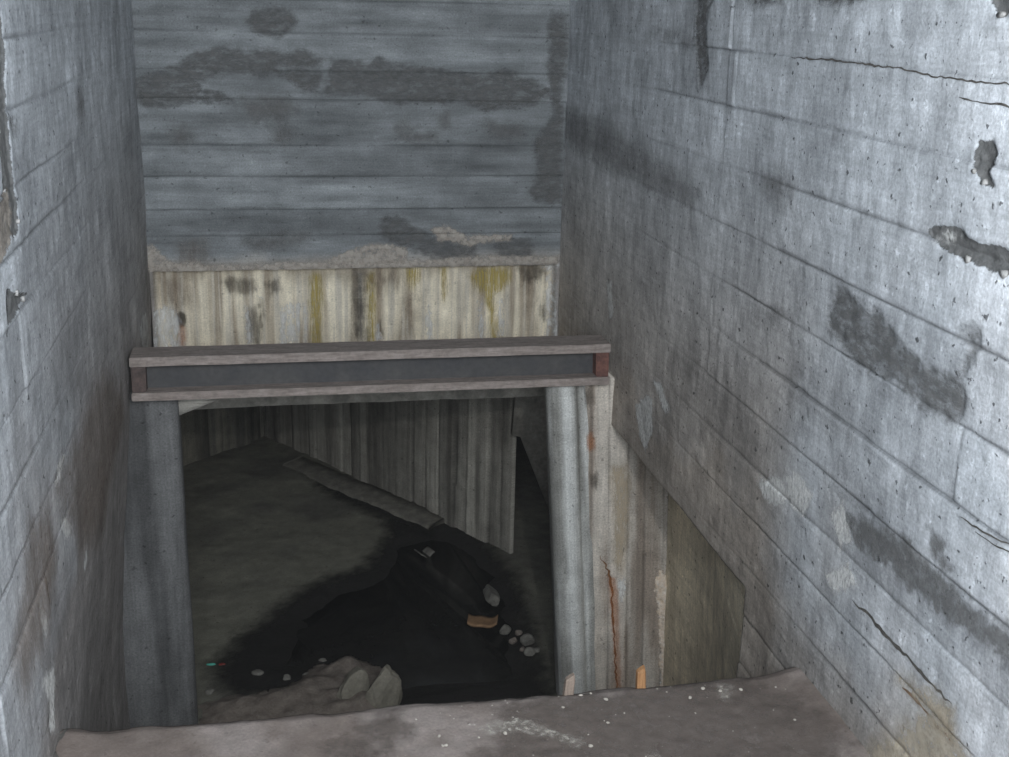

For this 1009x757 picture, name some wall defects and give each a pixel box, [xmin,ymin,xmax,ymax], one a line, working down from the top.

spalling [992,0,1009,18]
crack [791,57,1009,108]
spalling [0,17,20,264]
spalling [971,140,997,189]
spalling [929,225,1009,279]
spalling [6,289,27,325]
damp [472,268,508,338]
damp [760,471,811,514]
damp [826,563,854,591]
damp [831,505,1009,657]
damp [872,677,964,757]